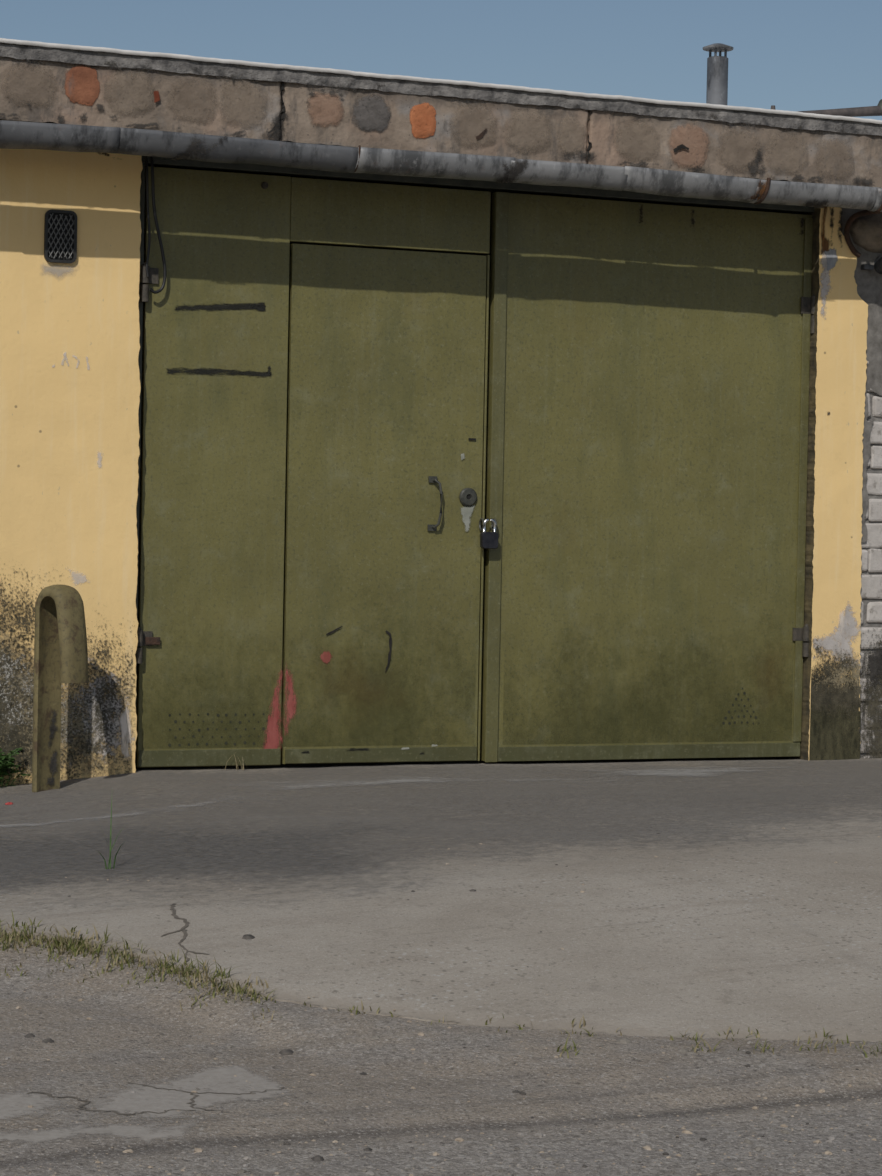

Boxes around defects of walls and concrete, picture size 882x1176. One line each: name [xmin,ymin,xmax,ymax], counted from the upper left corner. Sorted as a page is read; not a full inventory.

peeling [820,249,838,315]
flaking render [841,208,882,543]
damp [0,568,55,786]
damp [60,626,136,777]
damp [809,631,882,760]
crack [162,903,206,961]